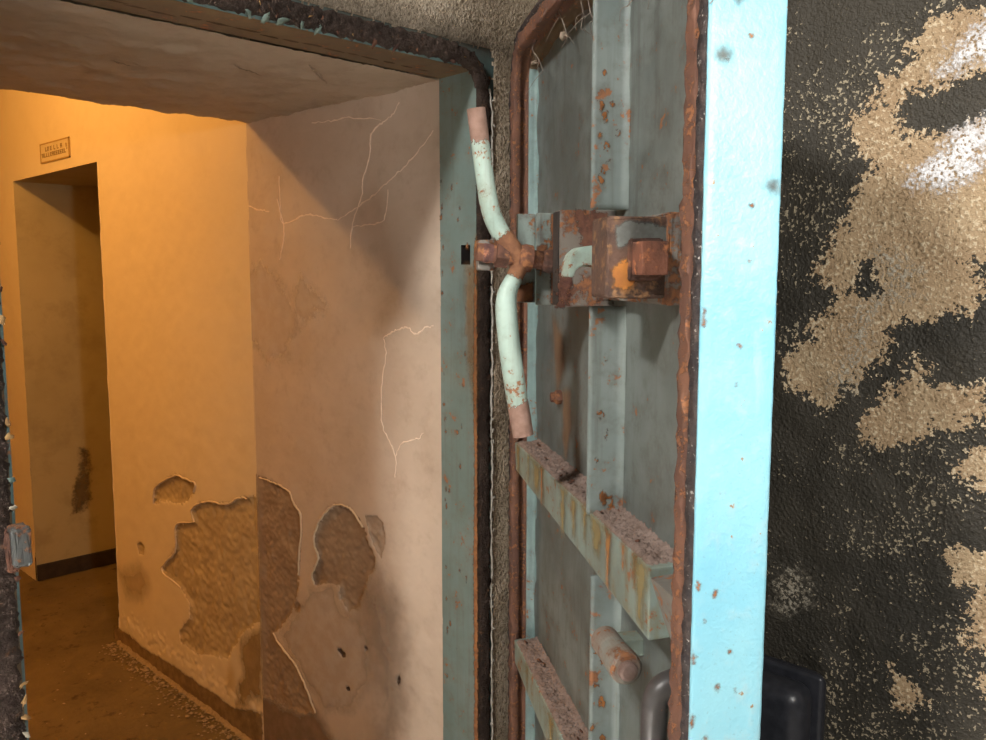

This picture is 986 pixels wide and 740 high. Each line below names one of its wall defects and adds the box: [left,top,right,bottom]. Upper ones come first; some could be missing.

rust [494,0,575,390]
rust [574,209,608,246]
leakage [72,449,90,513]
spalling [152,474,385,716]
crack [381,325,433,477]
rust [508,418,543,740]
rust [560,489,611,588]
rust [667,0,706,740]